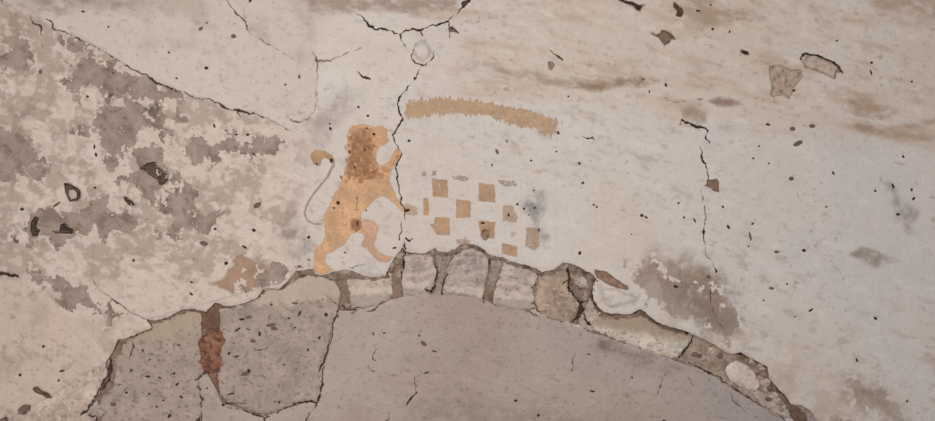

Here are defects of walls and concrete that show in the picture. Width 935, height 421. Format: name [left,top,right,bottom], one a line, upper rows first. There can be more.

crack [31,19,263,118]
flaking render [769,52,843,99]
crack [195,0,471,421]
crack [680,119,717,301]
spalling [235,316,277,351]
flaking render [423,222,645,307]
peeling [650,252,681,288]
water stain [643,261,731,324]
peeling [693,275,745,328]
crack [80,332,141,421]